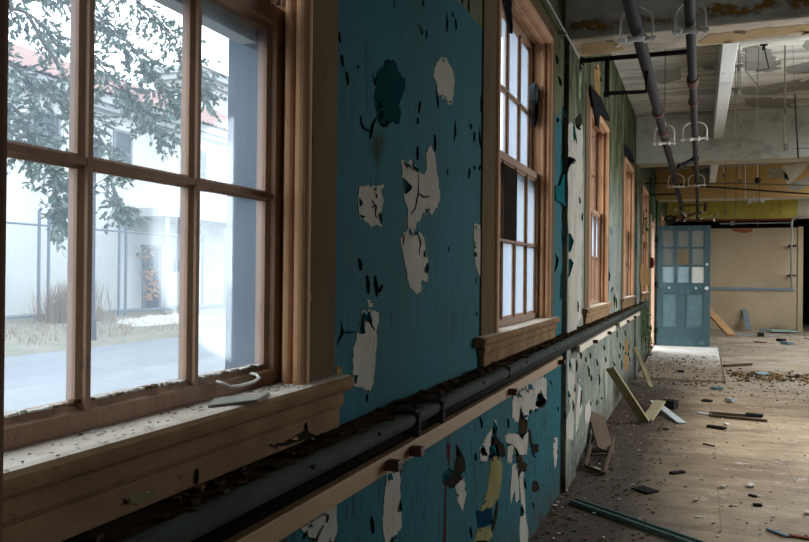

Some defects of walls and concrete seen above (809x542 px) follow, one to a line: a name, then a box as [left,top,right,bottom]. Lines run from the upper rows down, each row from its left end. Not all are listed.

rust [699,0,777,17]
peeling [433,56,454,105]
peeling [698,24,809,108]
peeling [358,184,384,228]
peeling [400,145,440,295]
peeling [560,106,583,333]
peeling [352,300,379,402]
peeling [382,471,402,542]
peeling [473,376,547,542]
peeling [553,357,592,468]